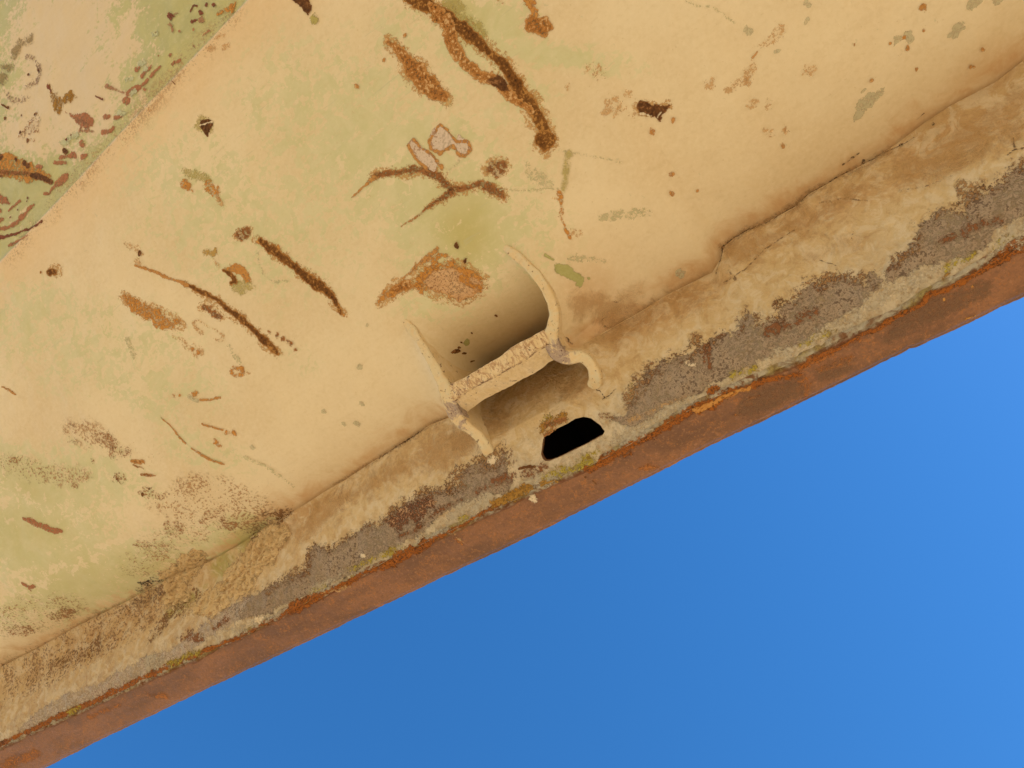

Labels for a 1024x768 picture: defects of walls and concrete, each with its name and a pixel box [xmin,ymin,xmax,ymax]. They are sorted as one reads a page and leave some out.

corrosion [0,193,43,246]
corrosion [0,151,69,195]
corrosion [0,33,77,143]
corrosion [118,242,297,358]
corrosion [233,226,347,317]
corrosion [382,33,453,106]
corrosion [375,242,490,308]
peeling [407,123,472,172]
corrosion [403,0,583,239]
crack [716,113,935,283]
corrosion [580,236,1024,485]
corrosion [0,476,501,768]